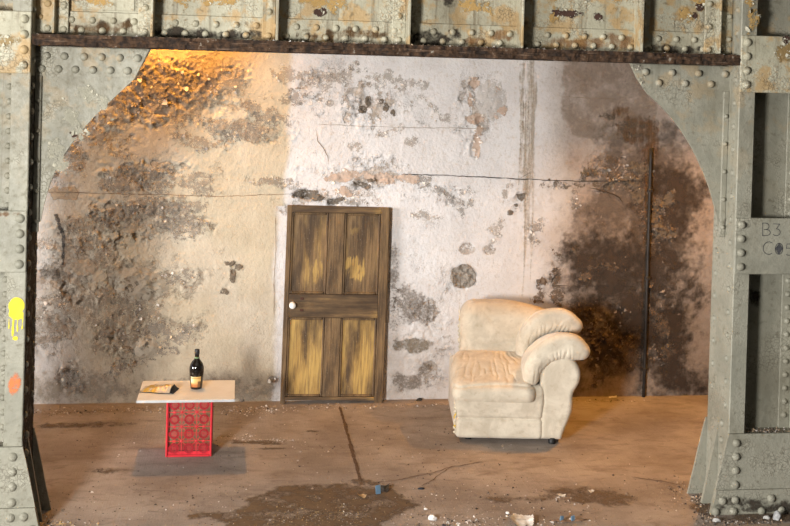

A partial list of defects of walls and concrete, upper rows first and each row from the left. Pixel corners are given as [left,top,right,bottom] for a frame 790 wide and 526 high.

peeling [157,0,239,10]
peeling [299,0,347,17]
peeling [548,0,603,23]
peeling [774,36,790,63]
peeling [150,63,191,107]
peeling [45,78,143,174]
spalling [358,95,395,116]
peeling [465,76,508,159]
spalling [219,260,244,295]
spalling [450,264,476,288]
crack [339,406,478,486]
damp [188,484,419,526]